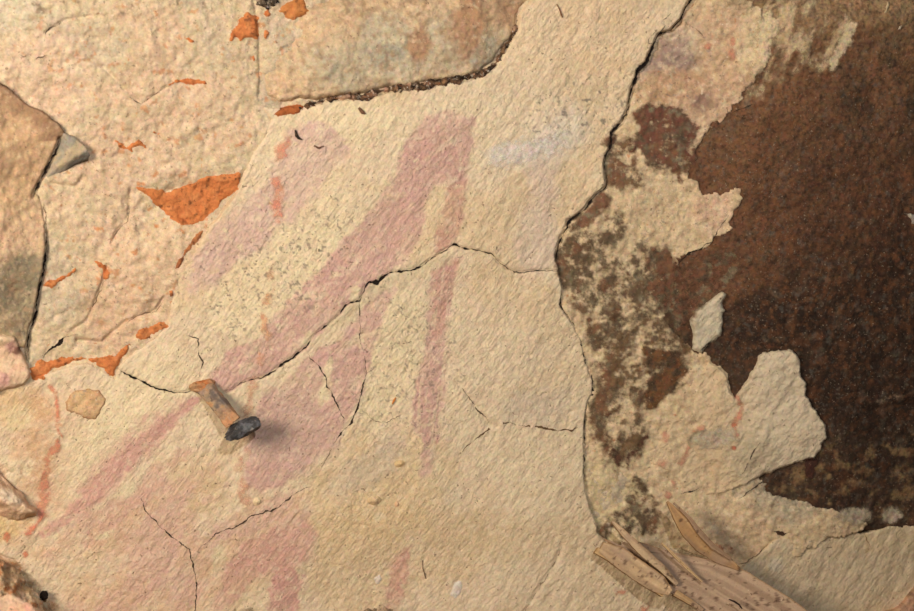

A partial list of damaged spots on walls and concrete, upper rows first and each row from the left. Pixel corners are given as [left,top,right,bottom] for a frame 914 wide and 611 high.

crack [232,0,703,478]
crack [120,335,204,393]
crack [141,487,308,611]